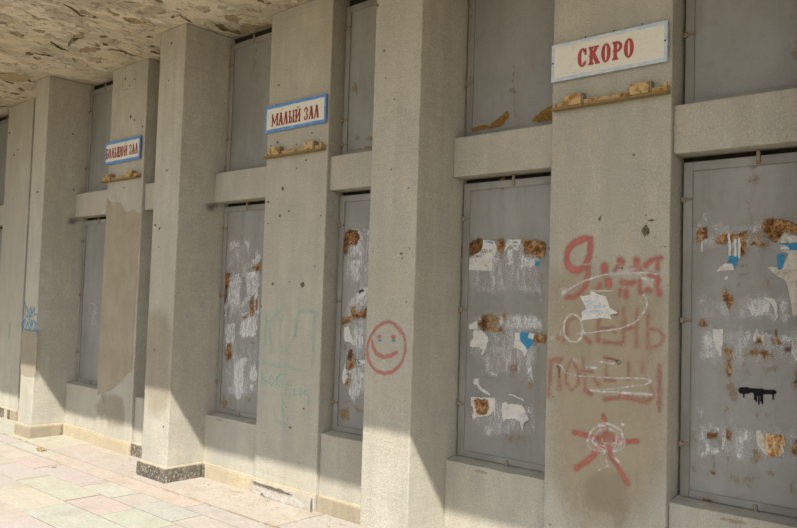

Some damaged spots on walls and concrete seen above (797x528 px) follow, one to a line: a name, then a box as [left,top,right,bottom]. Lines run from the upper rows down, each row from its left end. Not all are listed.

peeling [78,0,180,24]
peeling [197,5,272,35]
crack [35,39,79,62]
peeling [67,30,122,63]
peeling [0,62,36,107]
peeling [97,199,140,395]
leakage [556,282,657,516]
spalling [253,482,312,510]